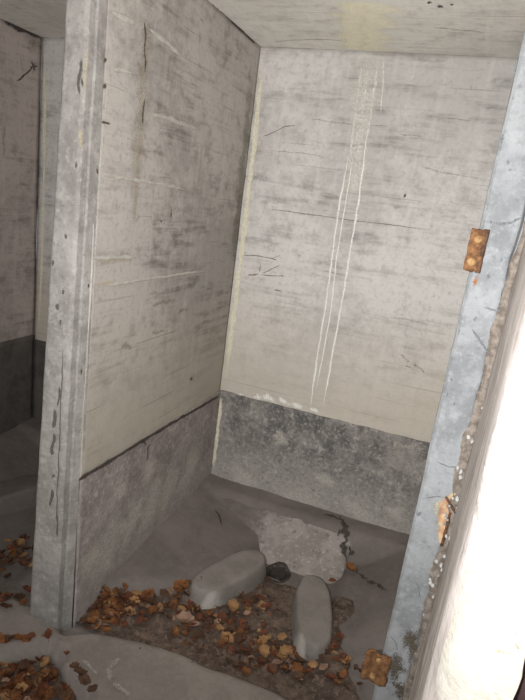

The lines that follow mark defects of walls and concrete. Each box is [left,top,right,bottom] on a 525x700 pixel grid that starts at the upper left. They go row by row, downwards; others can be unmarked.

damp [310,0,409,408]
crack [324,514,388,590]
spalling [402,221,525,700]